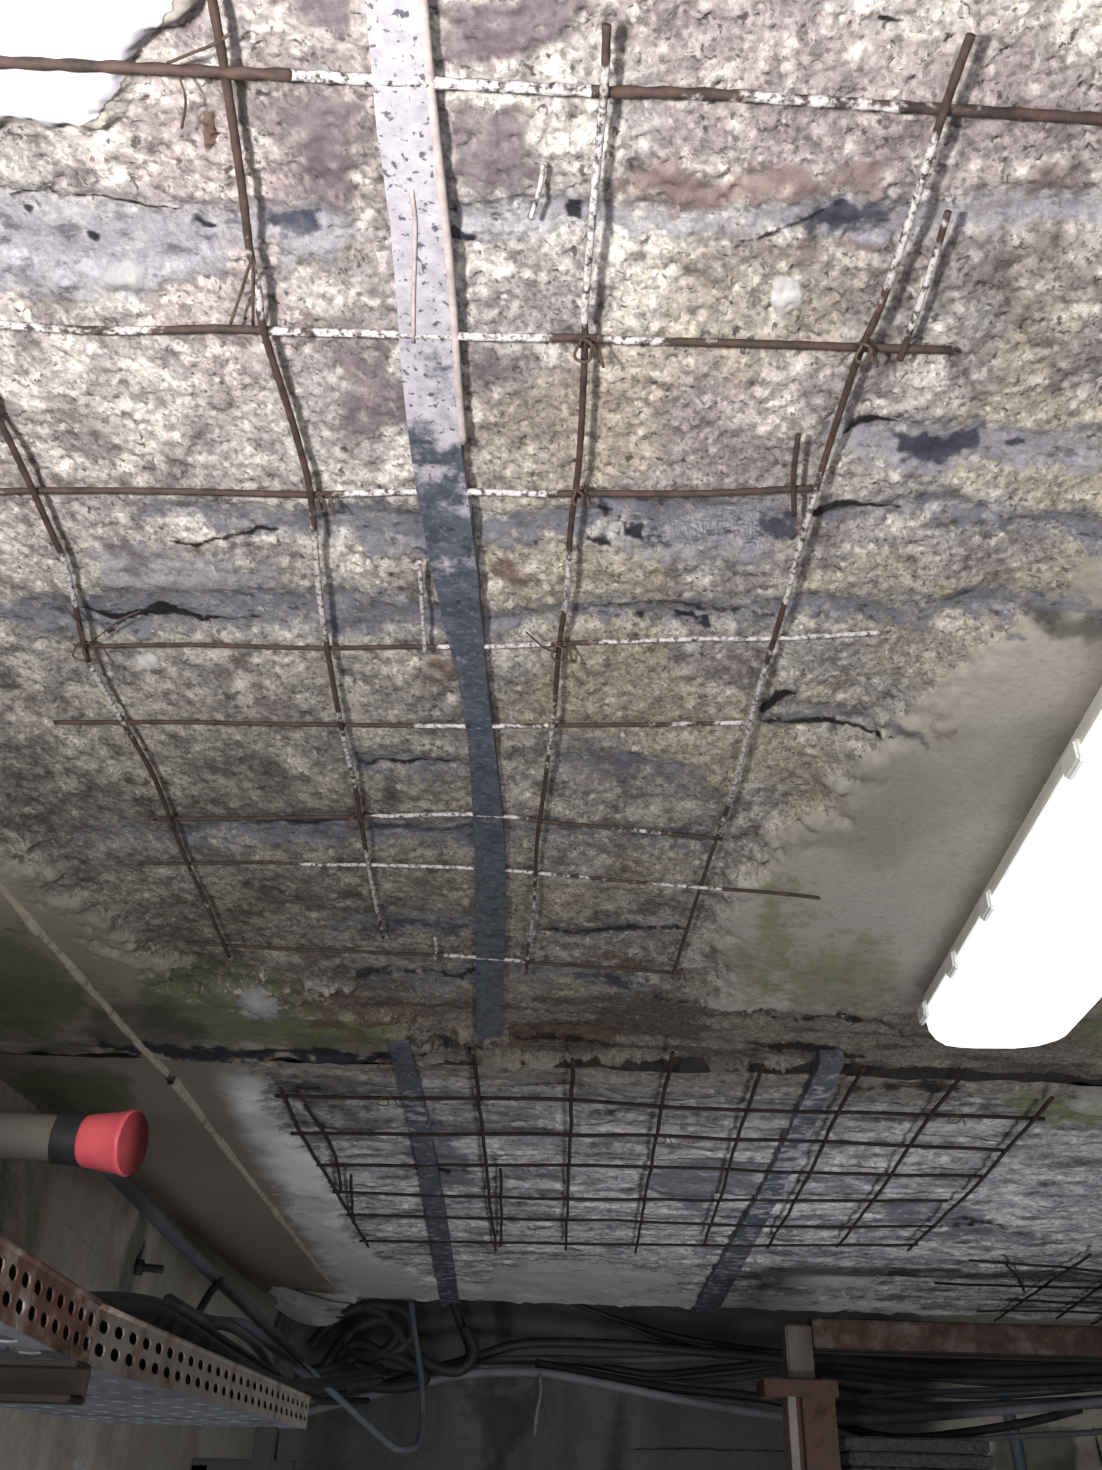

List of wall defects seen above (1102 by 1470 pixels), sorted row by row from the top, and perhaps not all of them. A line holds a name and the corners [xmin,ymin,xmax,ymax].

rust [438,0,594,69]
rust [287,97,356,194]
rust [448,104,540,190]
rust [630,160,880,209]
rust [338,346,407,434]
crack [169,525,278,548]
spalling [0,0,1102,1098]
crack [812,499,901,517]
crack [82,601,261,632]
crack [760,689,881,740]
crack [359,757,450,765]
spalling [241,1051,1102,1326]